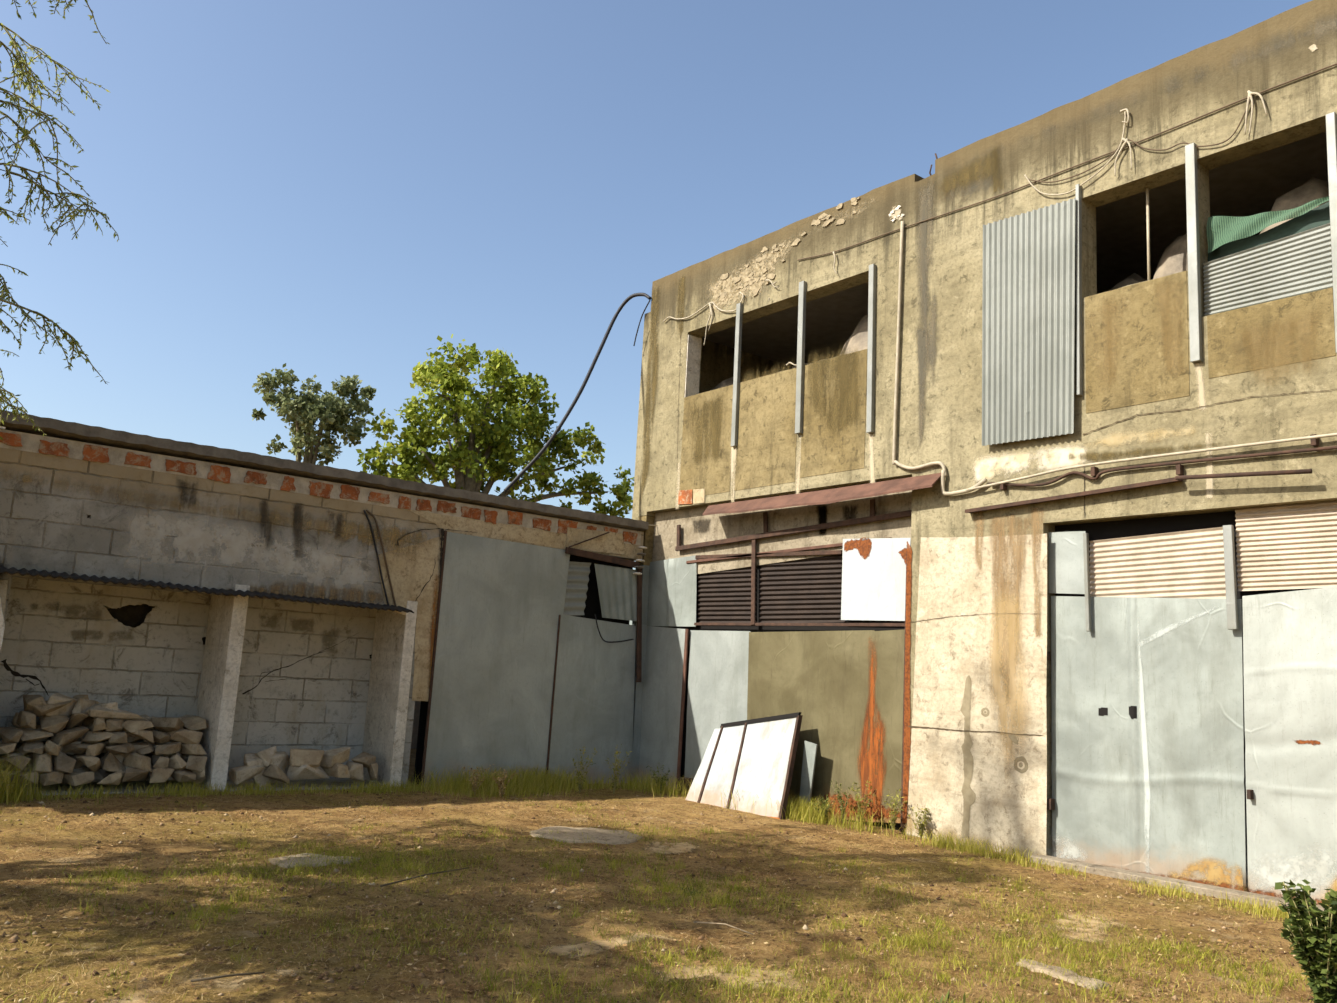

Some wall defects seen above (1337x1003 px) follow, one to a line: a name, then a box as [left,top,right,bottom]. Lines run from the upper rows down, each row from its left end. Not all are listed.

flaking render [710,197,860,311]
rust [844,537,872,559]
crack [0,659,49,696]
rust [801,541,912,824]